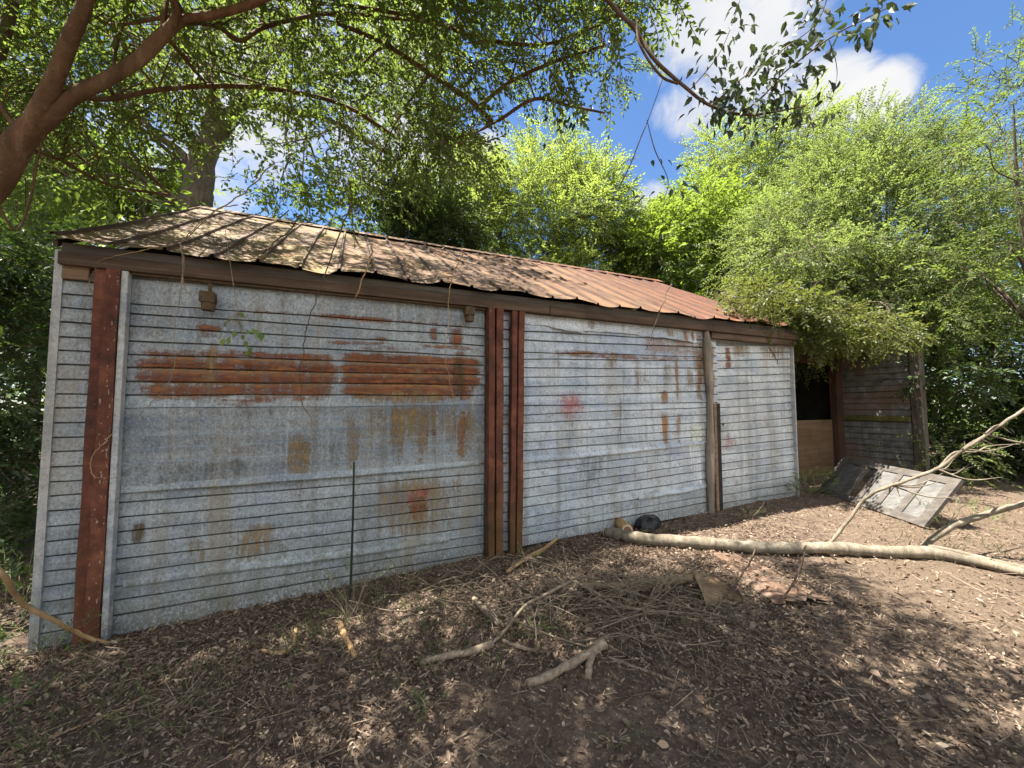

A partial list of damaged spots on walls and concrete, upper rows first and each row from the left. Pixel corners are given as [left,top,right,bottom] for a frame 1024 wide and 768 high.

corrosion [136,314,481,460]
corrosion [378,478,457,534]